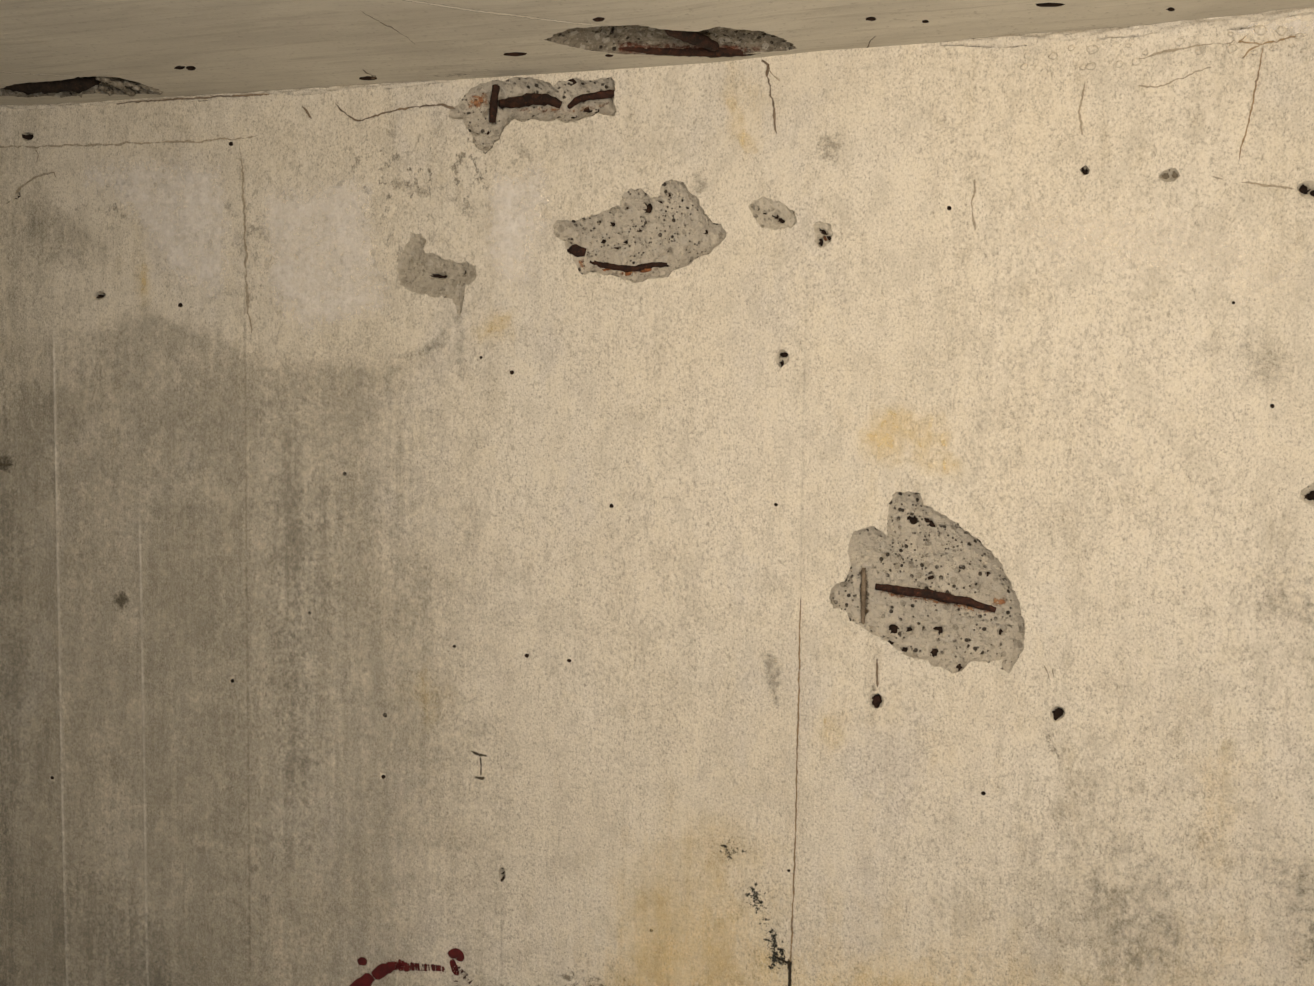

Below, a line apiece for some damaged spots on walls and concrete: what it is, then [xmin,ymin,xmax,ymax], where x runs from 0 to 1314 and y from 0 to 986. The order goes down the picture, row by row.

spalling [544,17,796,58]
spalling [448,76,616,154]
crack [1238,36,1296,160]
spalling [553,179,726,283]
spalling [829,491,1025,674]
crack [775,599,801,986]
leakage [745,882,790,970]